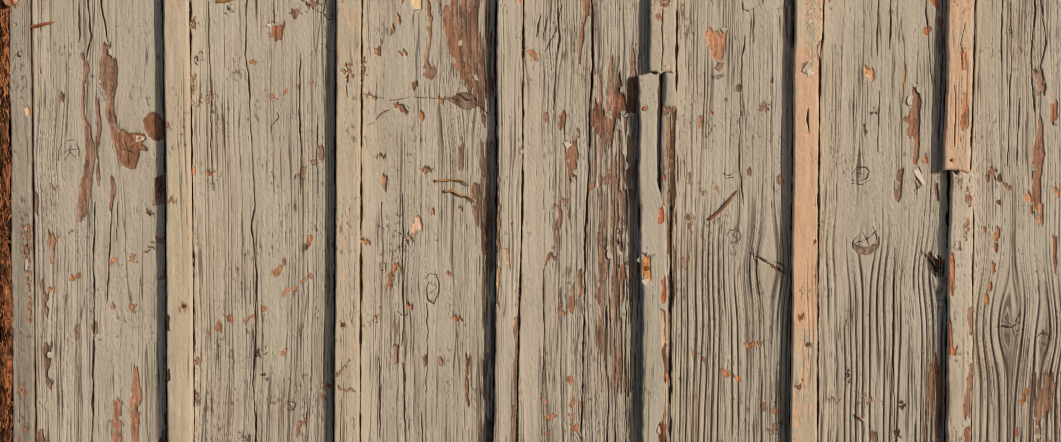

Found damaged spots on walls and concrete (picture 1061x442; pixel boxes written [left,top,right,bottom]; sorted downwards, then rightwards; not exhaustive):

peeling [578,0,591,64]
peeling [706,27,728,80]
peeling [779,0,794,49]
peeling [894,63,939,202]
peeling [21,43,148,323]
peeling [390,0,509,442]
peeling [543,48,640,397]
peeling [111,365,142,442]
peeling [1030,367,1061,442]